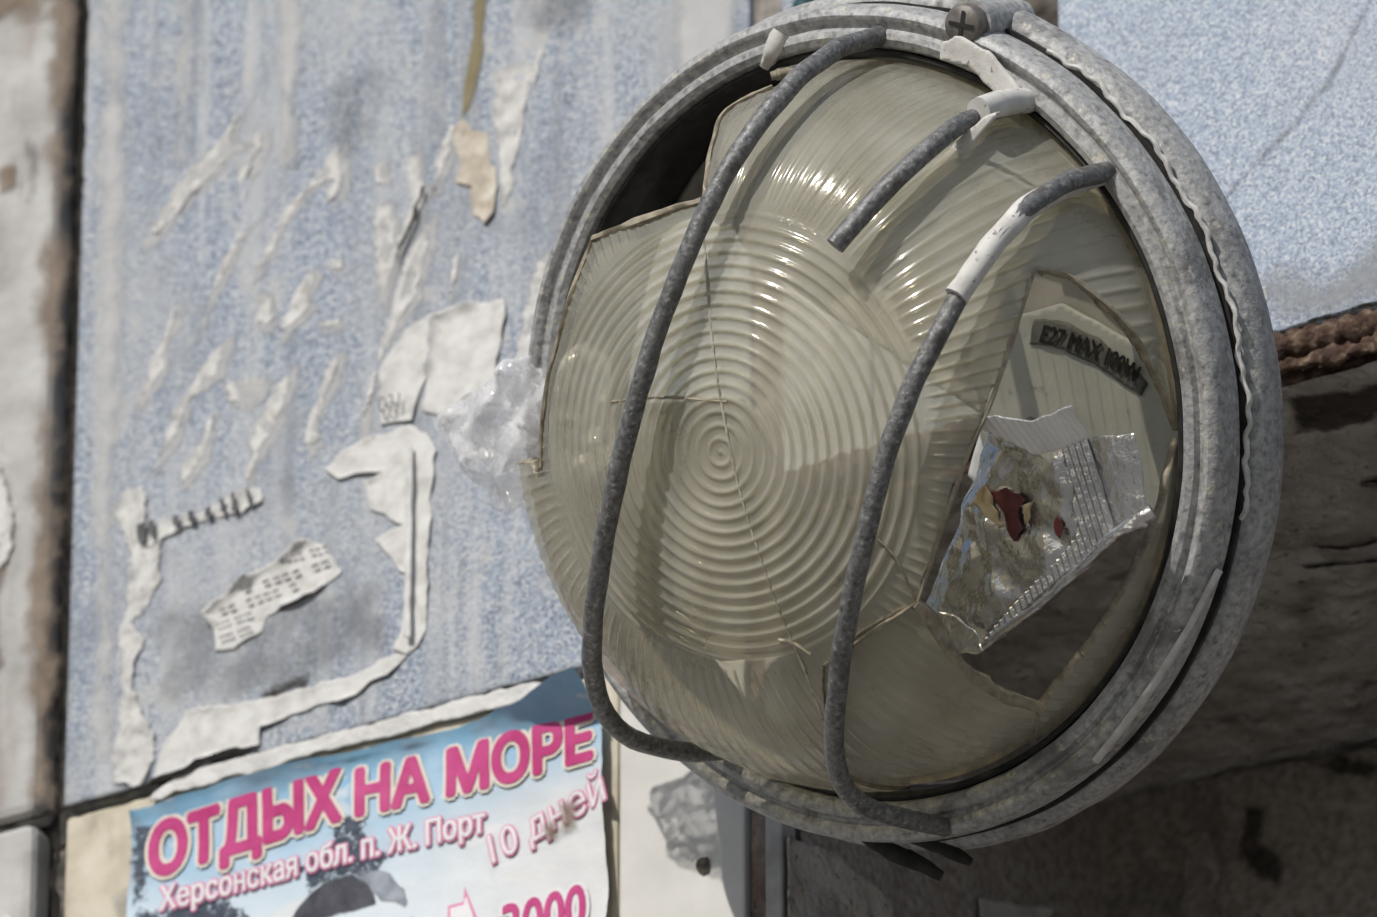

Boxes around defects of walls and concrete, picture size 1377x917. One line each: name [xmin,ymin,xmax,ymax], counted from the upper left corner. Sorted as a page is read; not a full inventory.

corrosion [1274,308,1377,375]
corrosion [893,414,981,471]
corrosion [785,444,879,502]